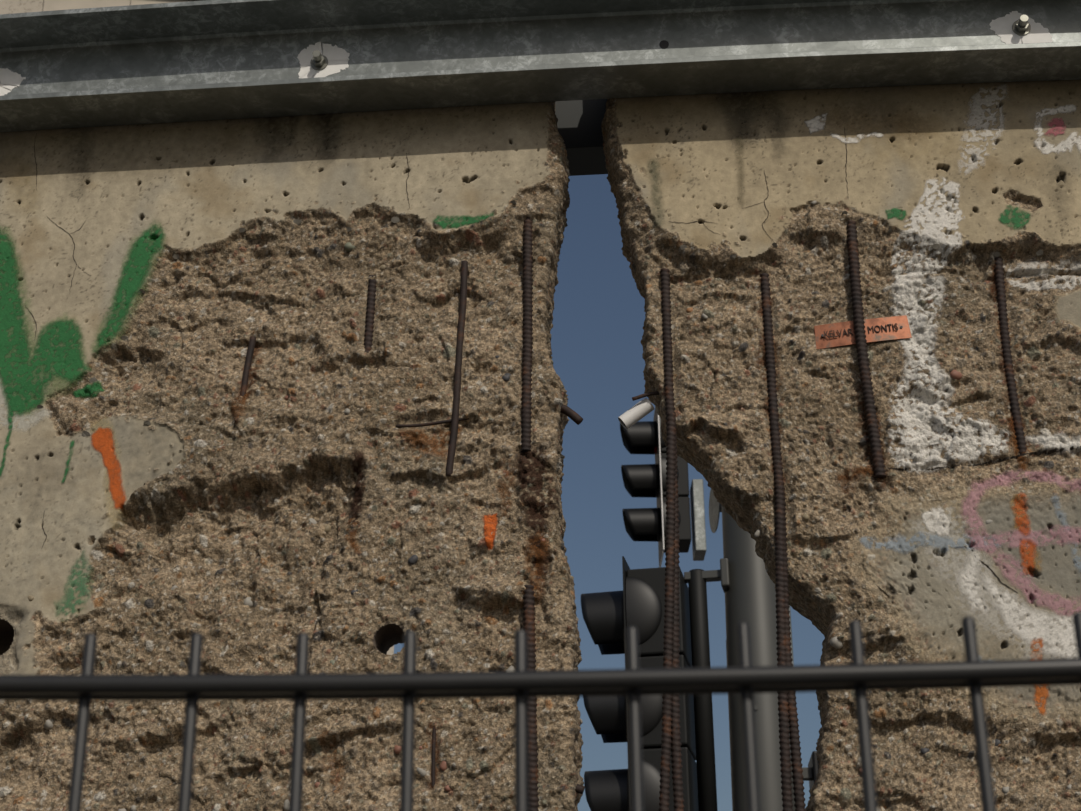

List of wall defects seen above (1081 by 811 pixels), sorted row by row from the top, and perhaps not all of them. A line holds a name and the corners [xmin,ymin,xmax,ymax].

spalling [0,105,582,675]
spalling [601,98,1081,665]
corrosion [838,385,887,486]
corrosion [349,451,364,552]
corrosion [517,450,557,597]
spalling [0,699,402,811]
spalling [413,698,515,811]
spalling [536,697,585,811]
spalling [805,691,864,811]
spalling [867,688,982,811]
spalling [983,693,1081,811]